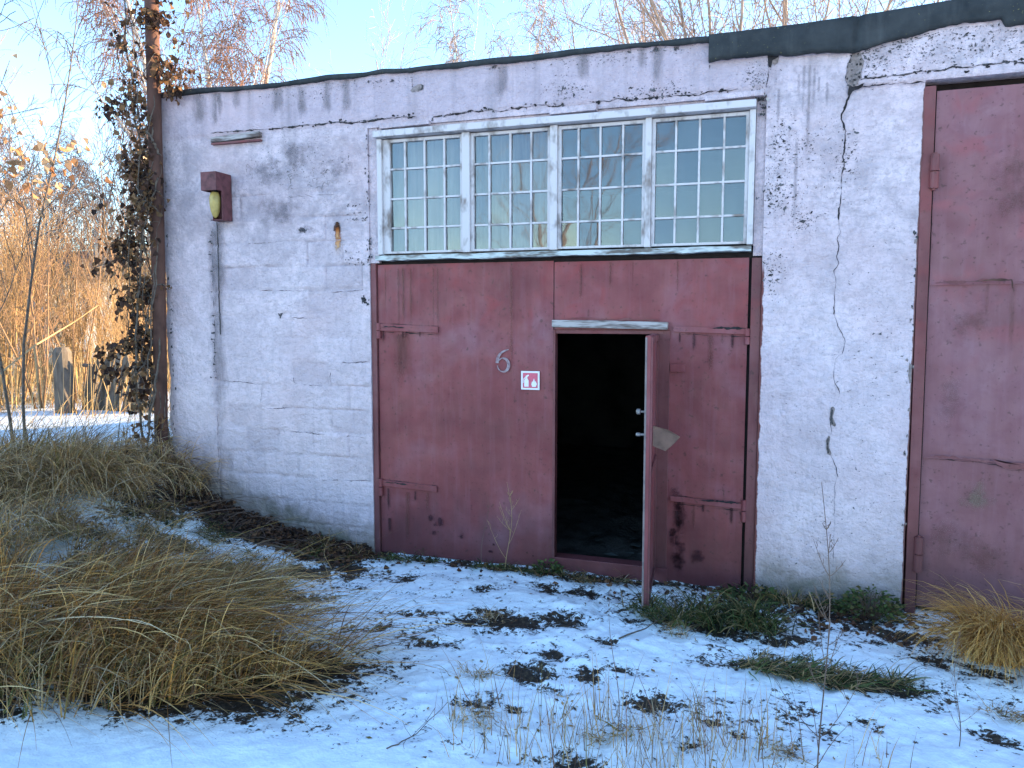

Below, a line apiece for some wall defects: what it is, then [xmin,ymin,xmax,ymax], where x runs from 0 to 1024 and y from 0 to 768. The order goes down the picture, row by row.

crack [593,88,736,104]
crack [213,101,564,133]
corrosion [333,222,341,249]
crack [829,57,1024,393]